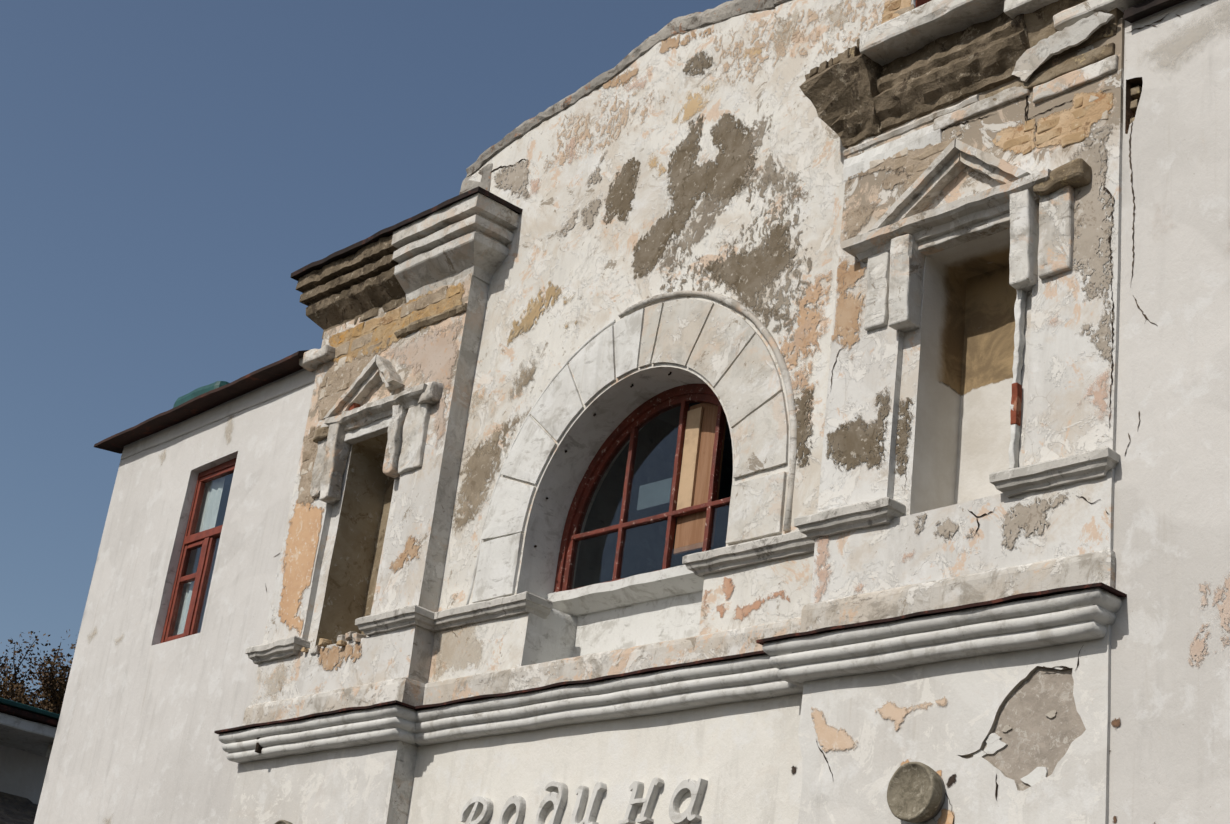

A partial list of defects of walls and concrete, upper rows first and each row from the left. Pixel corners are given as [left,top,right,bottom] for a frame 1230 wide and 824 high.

flaking render [502,280,574,350]
flaking render [494,0,915,279]
flaking render [704,223,866,467]
flaking render [843,130,961,240]
flaking render [992,77,1143,417]
crack [1103,118,1158,454]
flaking render [278,282,466,671]
flaking render [913,513,979,543]
flaking render [1000,492,1069,550]
peeling [811,707,858,753]
peeling [875,697,948,731]
flaking render [958,666,1086,791]